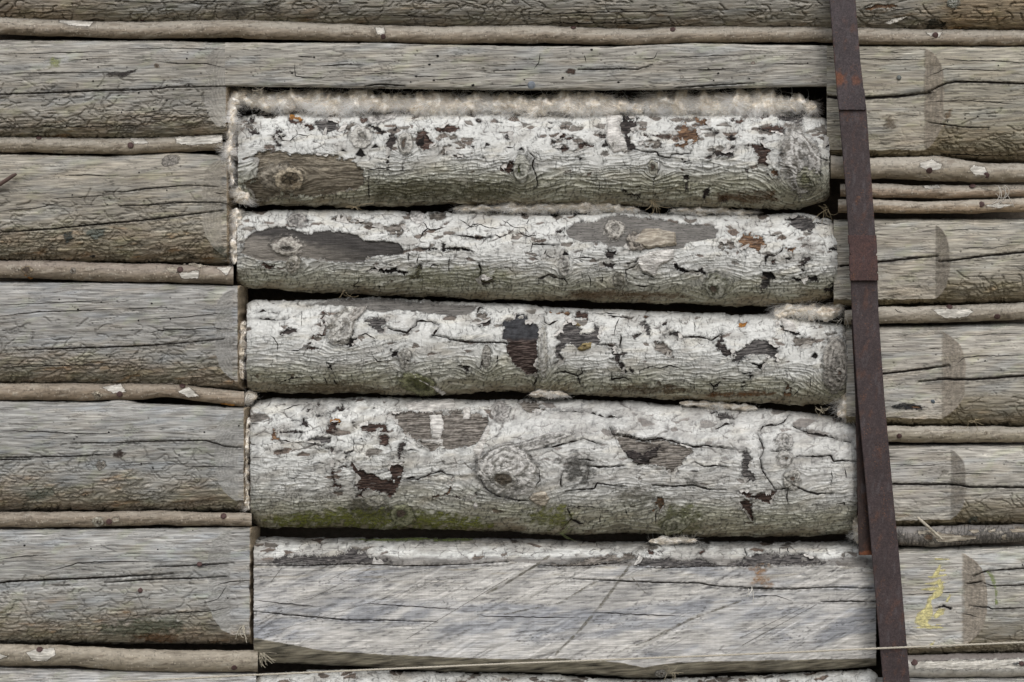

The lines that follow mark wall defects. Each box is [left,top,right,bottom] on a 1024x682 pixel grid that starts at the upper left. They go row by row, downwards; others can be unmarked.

crack [860,58,1024,128]
peeling [244,114,397,202]
peeling [416,122,490,159]
peeling [548,113,804,190]
peeling [241,214,423,280]
peeling [556,214,834,293]
peeling [302,286,634,377]
peeling [715,334,781,387]
crack [883,333,1024,382]
peeling [271,349,490,498]
peeling [739,450,776,521]
crack [477,611,674,619]